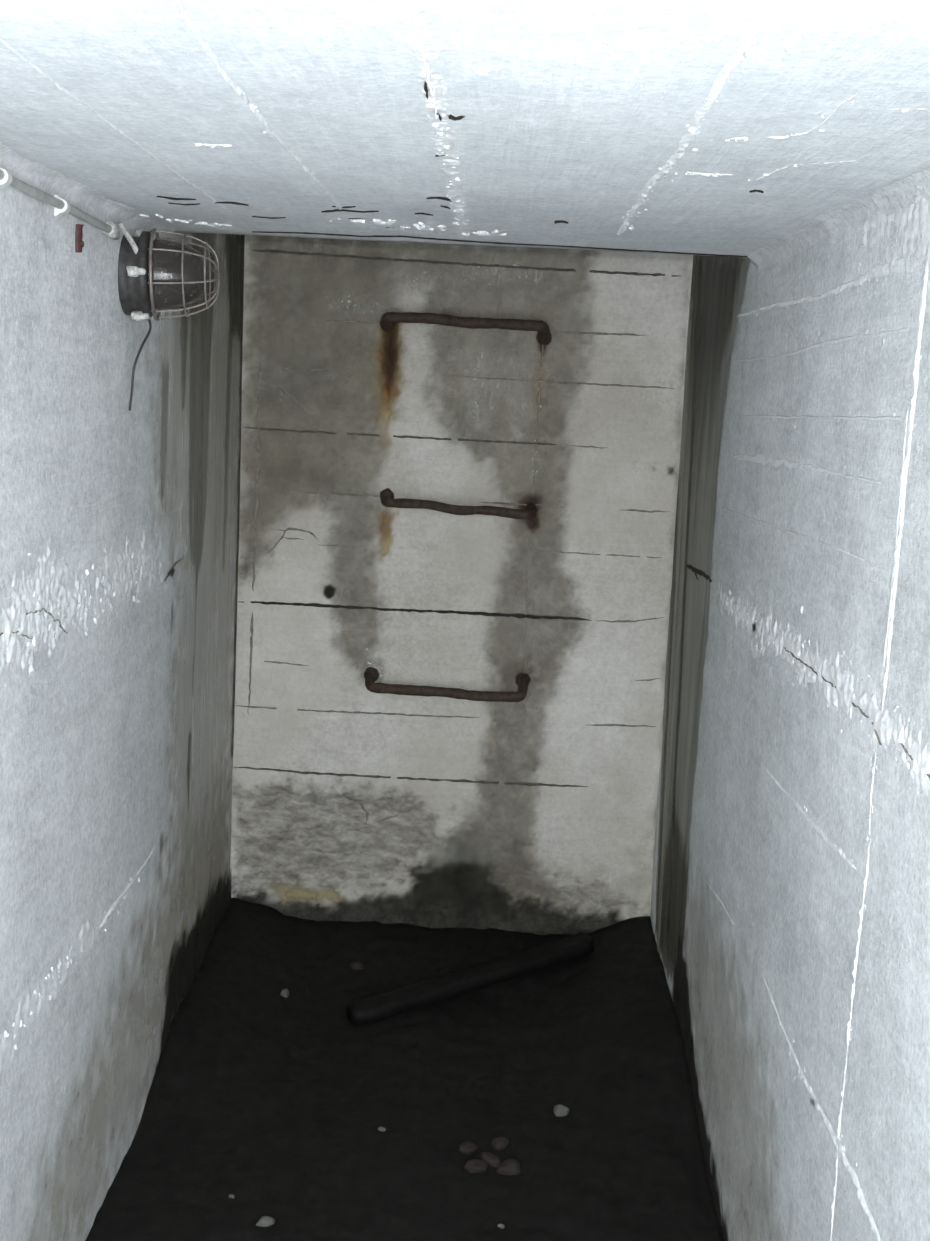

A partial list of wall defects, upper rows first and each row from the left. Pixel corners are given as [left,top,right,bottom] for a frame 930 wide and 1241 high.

crack [448,113,465,121]
corrosion [377,322,398,422]
corrosion [381,516,392,556]
leakage [226,234,590,904]